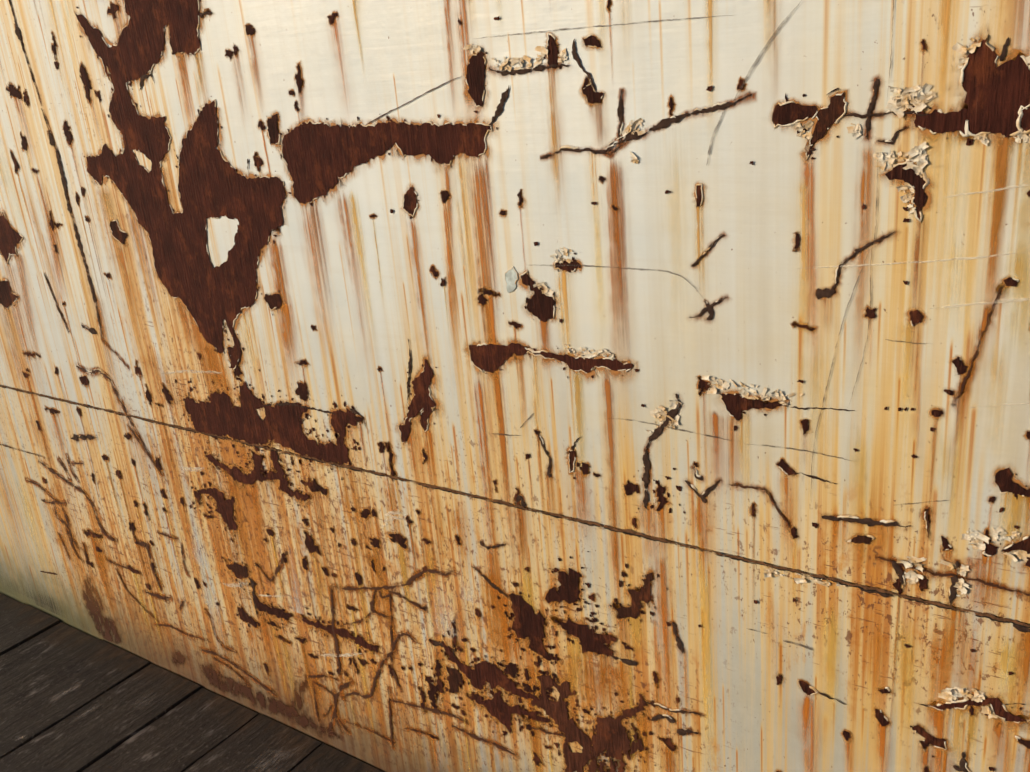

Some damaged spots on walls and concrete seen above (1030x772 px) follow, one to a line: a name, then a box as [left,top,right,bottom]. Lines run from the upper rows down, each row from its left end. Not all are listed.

peeling [876,30,1030,288]
peeling [0,210,29,316]
rust [134,359,185,557]
rust [295,359,309,402]
rust [201,441,441,750]
peeling [74,0,639,656]
rust [429,190,452,308]
peeling [421,556,671,736]
rust [522,601,705,772]
peeling [702,375,855,459]
rust [874,555,1030,666]
peeling [941,468,1030,598]